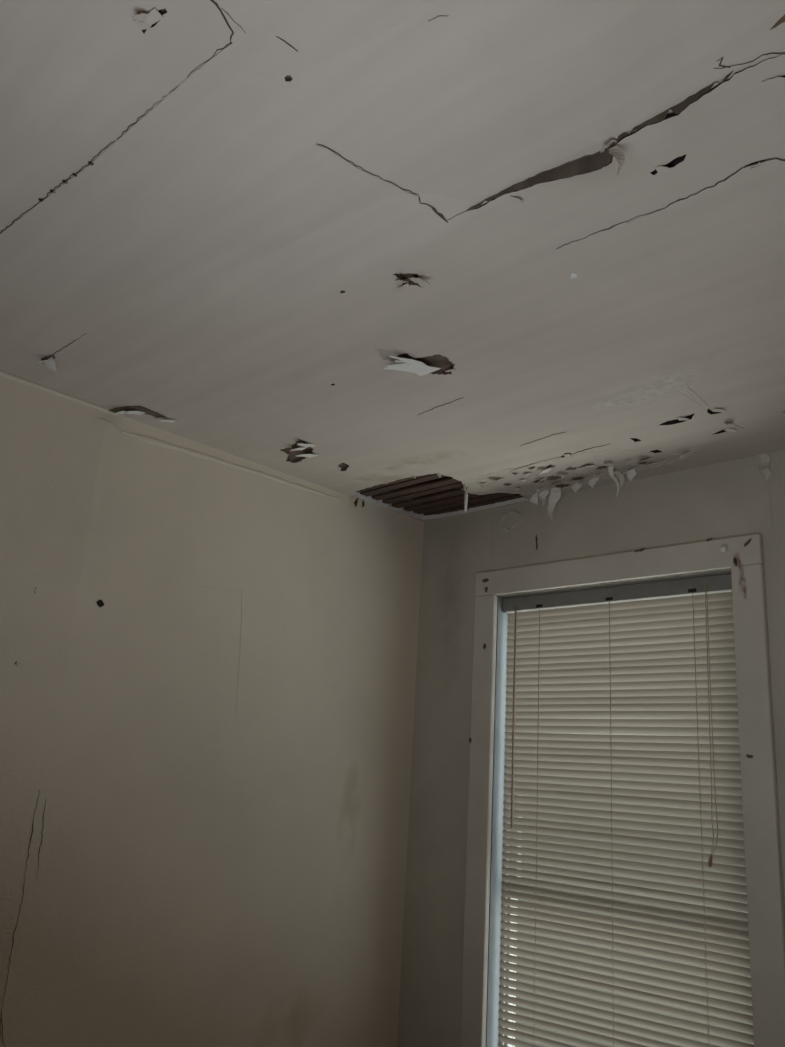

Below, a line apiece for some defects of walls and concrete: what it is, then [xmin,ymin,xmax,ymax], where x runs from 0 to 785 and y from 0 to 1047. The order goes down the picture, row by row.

peeling [132,8,167,34]
crack [0,0,246,235]
crack [316,53,785,223]
crack [557,158,785,249]
peeling [393,273,430,294]
peeling [384,353,455,376]
peeling [108,406,176,423]
peeling [280,439,318,463]
peeling [353,438,701,523]
crack [0,792,46,1044]